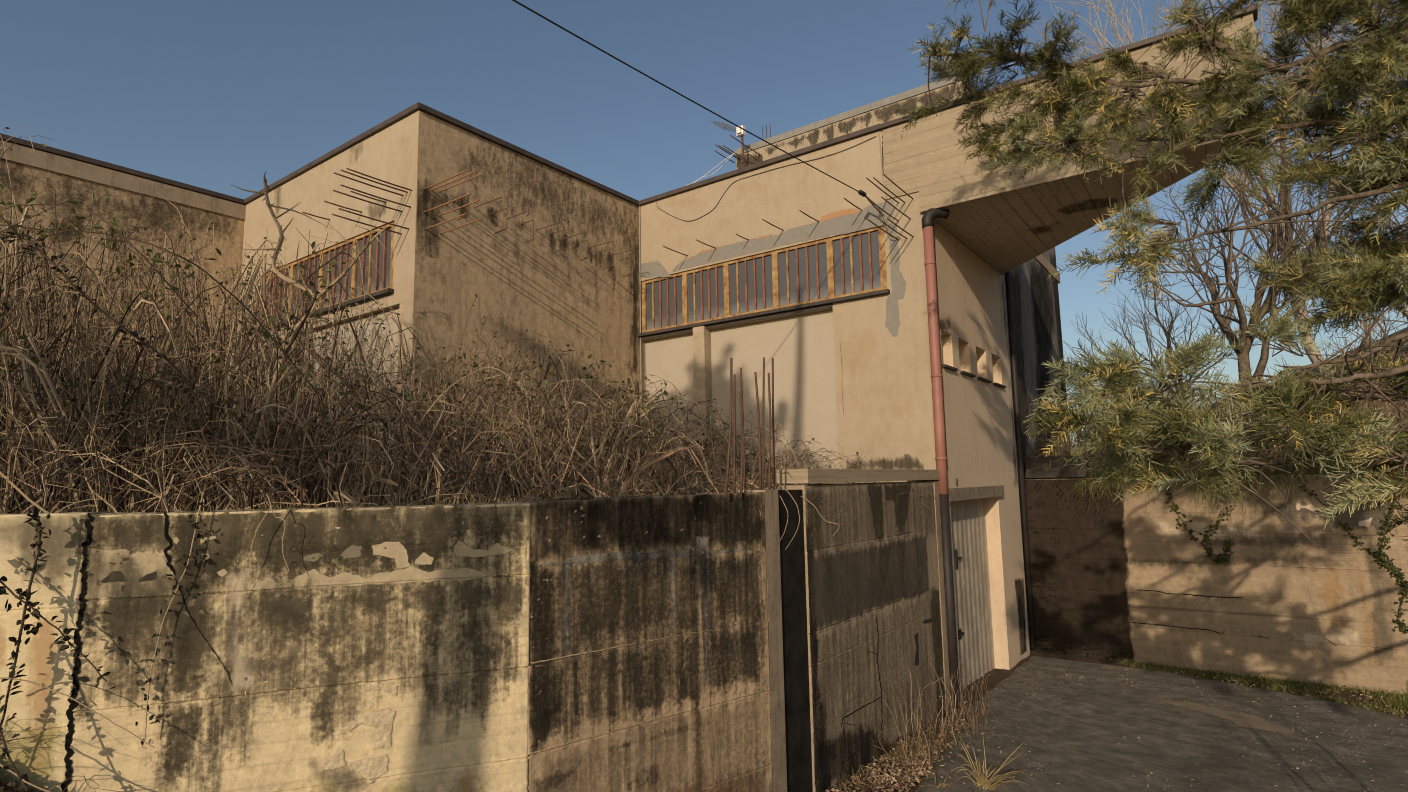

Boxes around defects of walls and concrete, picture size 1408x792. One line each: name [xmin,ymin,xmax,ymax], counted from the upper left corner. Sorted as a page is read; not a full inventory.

water stain [417,185,466,256]
water stain [470,153,640,371]
crack [61,513,94,792]
peeling [200,535,227,578]
peeling [250,541,513,591]
water stain [806,454,946,792]